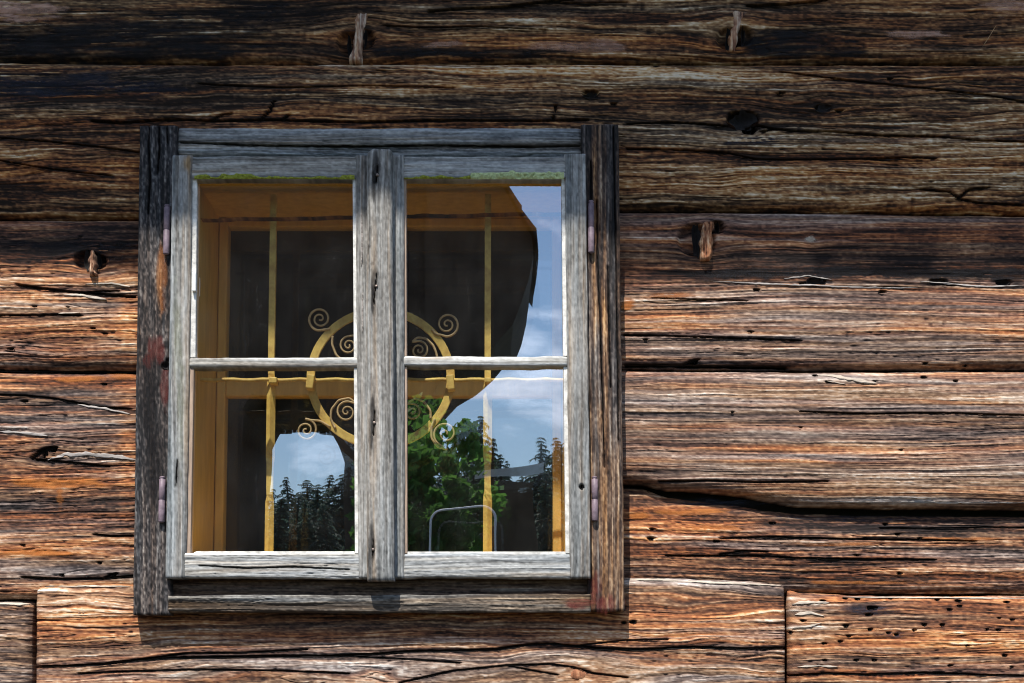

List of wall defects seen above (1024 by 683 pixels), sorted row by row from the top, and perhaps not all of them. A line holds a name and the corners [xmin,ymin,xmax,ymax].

crack [0,86,580,210]
crack [922,189,1024,206]
crack [33,448,105,467]
crack [48,639,783,681]